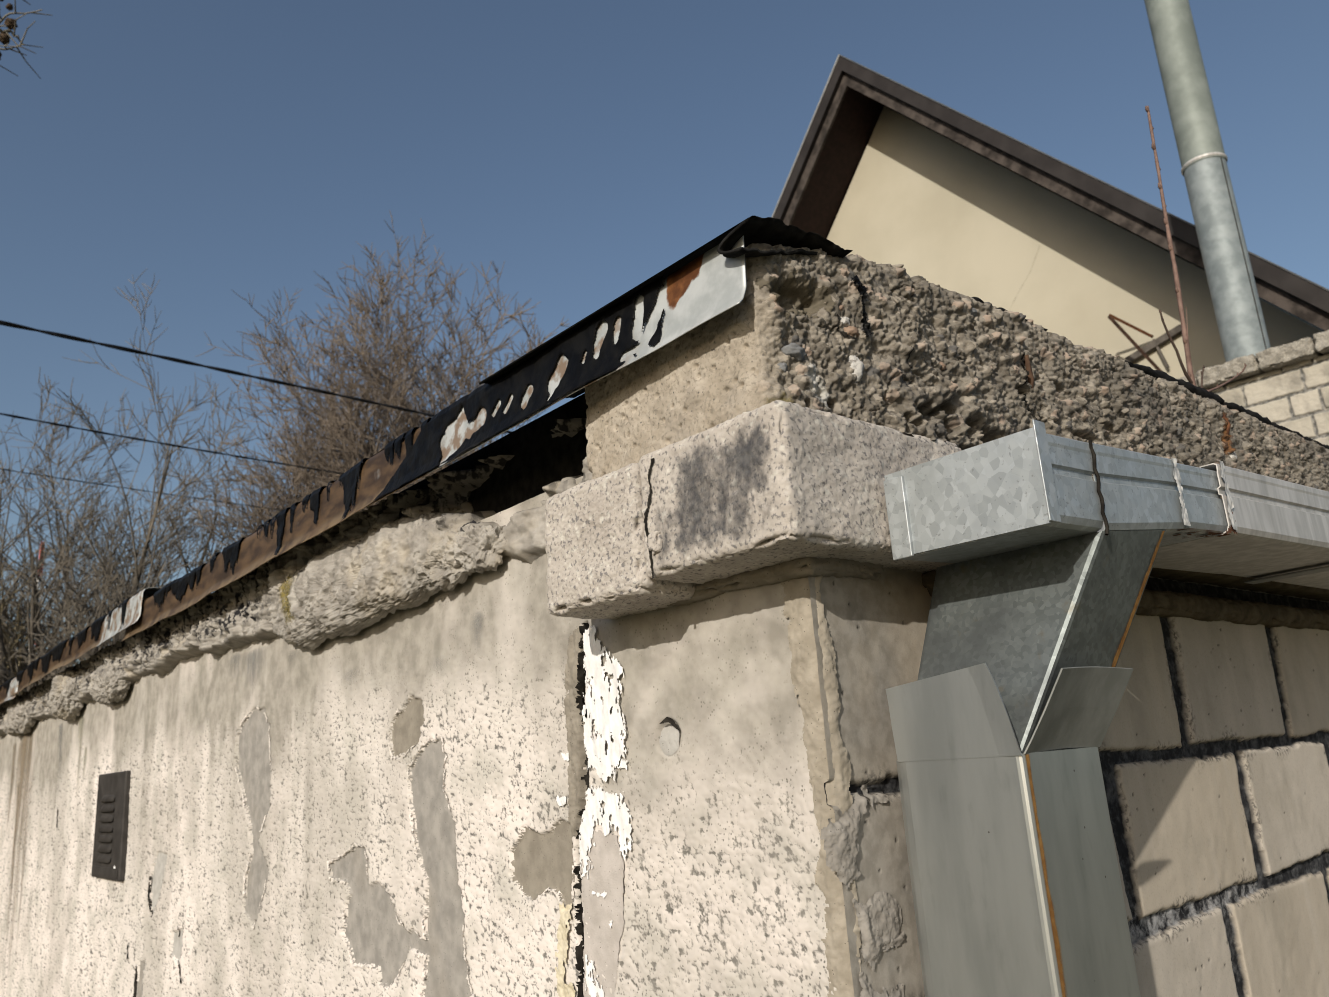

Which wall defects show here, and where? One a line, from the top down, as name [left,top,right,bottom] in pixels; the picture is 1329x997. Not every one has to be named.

crack [644,458,654,578]
leakage [662,427,769,552]
rust [1221,412,1236,454]
peeling [235,706,272,930]
peeling [327,695,473,997]
peeling [510,625,633,910]